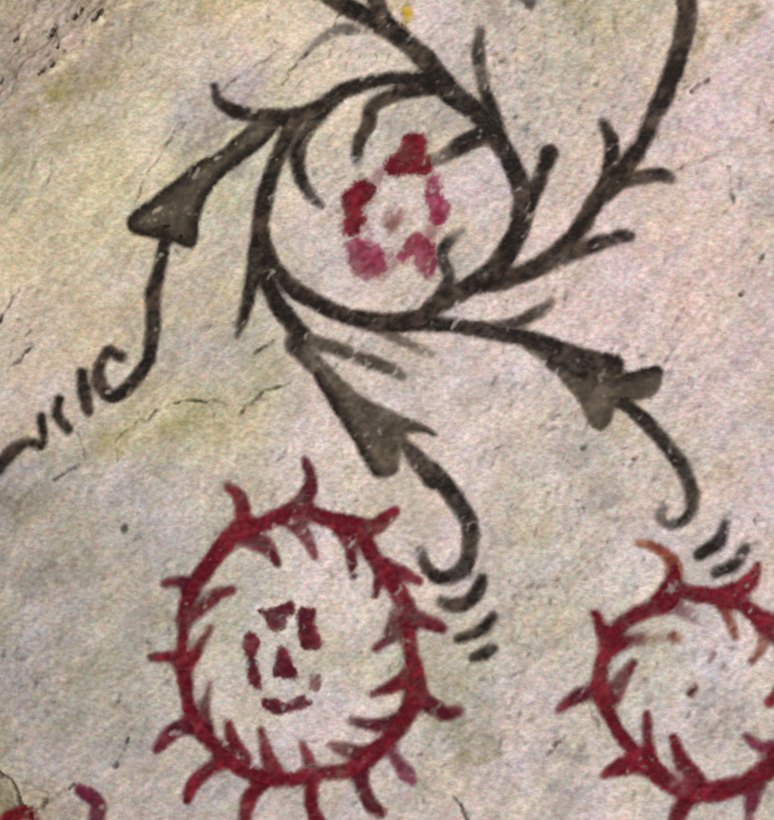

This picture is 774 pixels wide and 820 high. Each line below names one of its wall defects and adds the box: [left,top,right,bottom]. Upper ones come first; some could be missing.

flaking render [0,0,142,119]